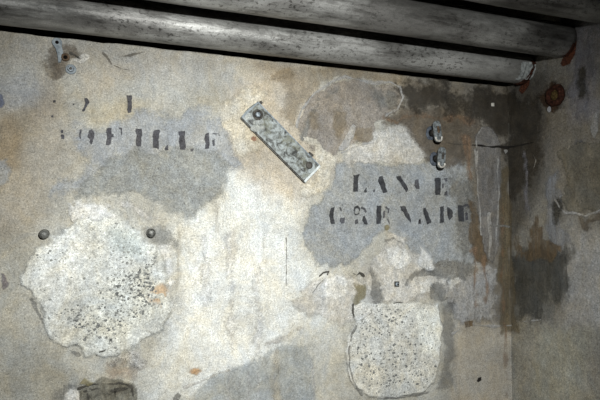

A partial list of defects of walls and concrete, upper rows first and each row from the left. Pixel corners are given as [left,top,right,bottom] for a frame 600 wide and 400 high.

corrosion [49,45,78,79]
water stain [386,76,562,256]
crack [447,142,533,154]
peeling [69,199,117,222]
peeling [158,244,174,307]
corrosion [469,201,488,268]
water stain [511,173,569,319]